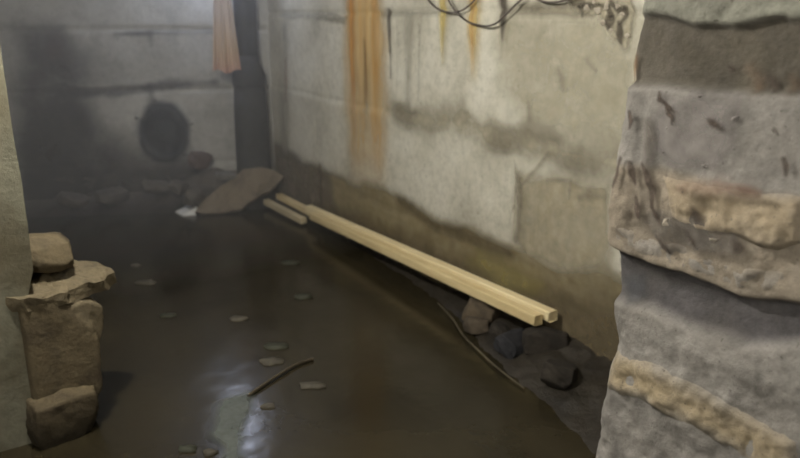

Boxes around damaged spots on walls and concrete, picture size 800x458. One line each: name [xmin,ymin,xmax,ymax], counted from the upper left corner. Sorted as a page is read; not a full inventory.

corrosion [347,0,383,138]
corrosion [469,0,478,45]
damp [513,4,628,128]
spalling [569,0,635,48]
damp [274,104,644,362]